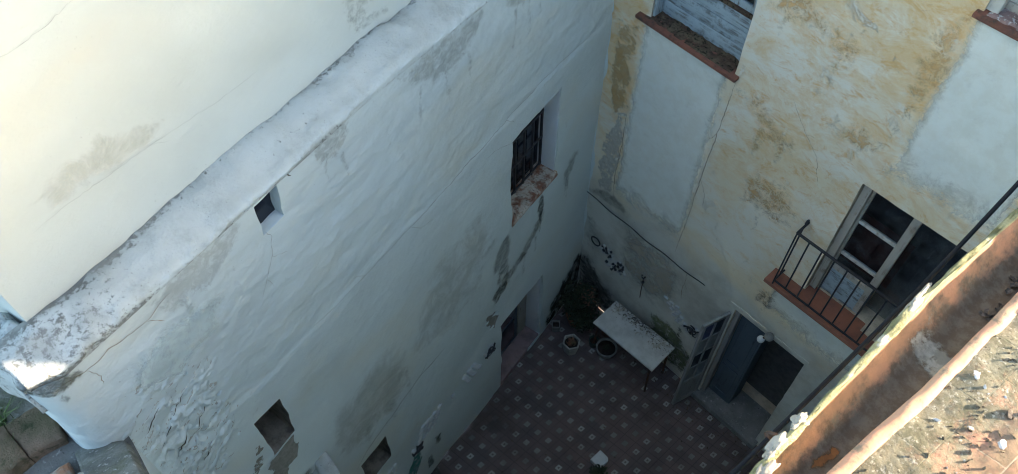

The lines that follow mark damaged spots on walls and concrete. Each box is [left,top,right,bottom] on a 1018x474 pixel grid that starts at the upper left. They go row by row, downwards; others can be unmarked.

crack [675,85,735,251]
crack [82,299,164,382]
peeling [122,355,241,474]
spalling [254,435,299,474]